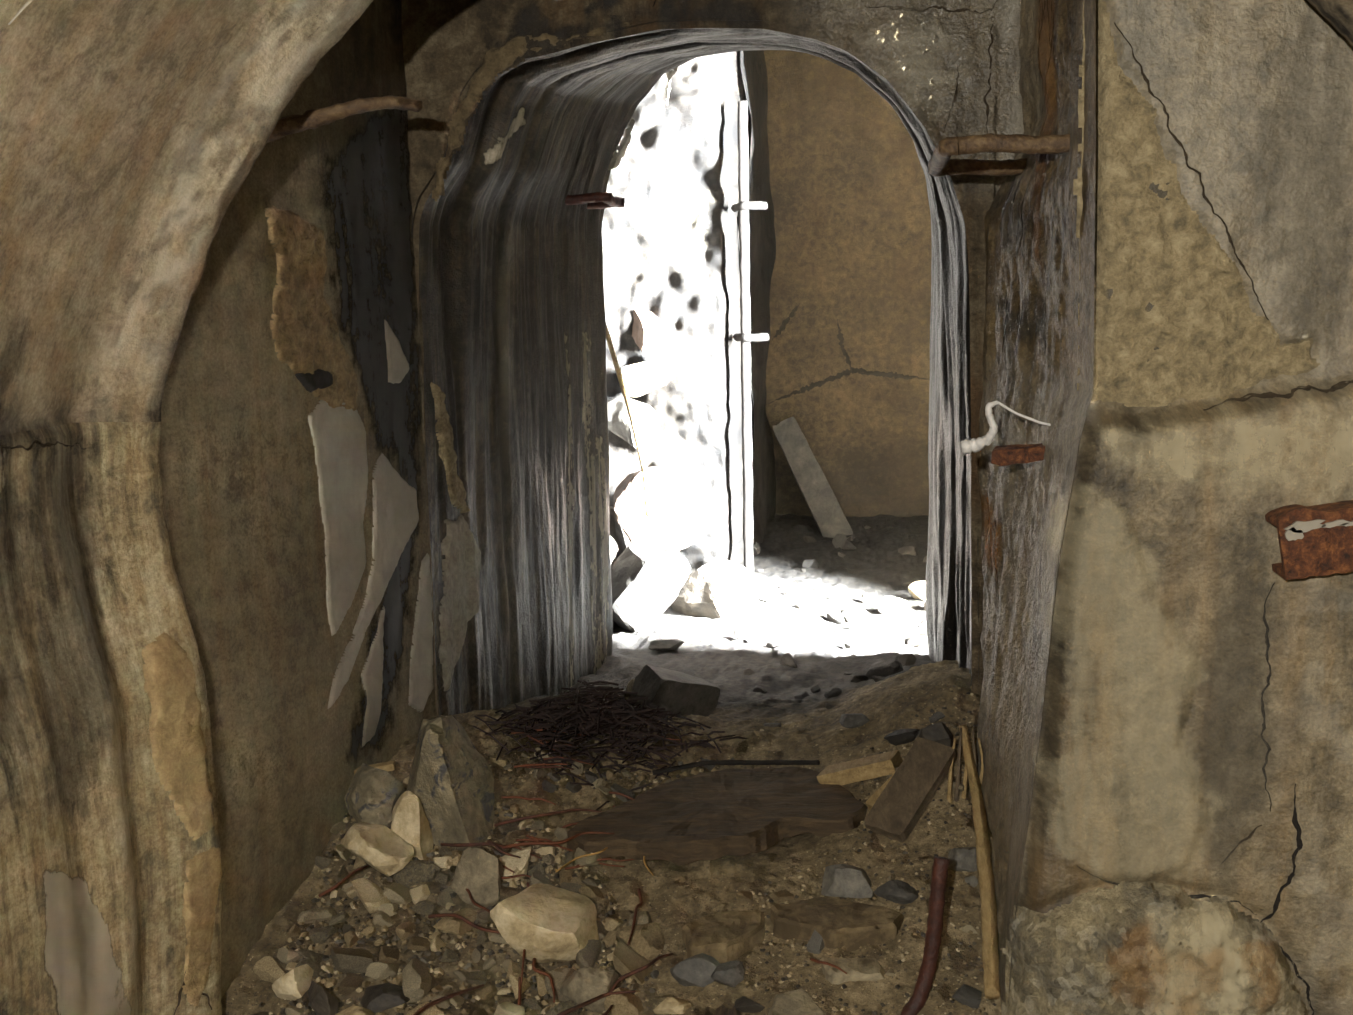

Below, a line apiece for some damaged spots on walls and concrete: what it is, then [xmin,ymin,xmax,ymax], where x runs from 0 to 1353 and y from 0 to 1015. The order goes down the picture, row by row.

crack [1114,23,1269,320]
spalling [1073,0,1320,407]
crack [2,440,87,451]
peeling [264,205,419,747]
peeling [408,382,481,712]
crack [1203,380,1353,410]
crack [1077,865,1119,885]
crack [1189,582,1314,1015]